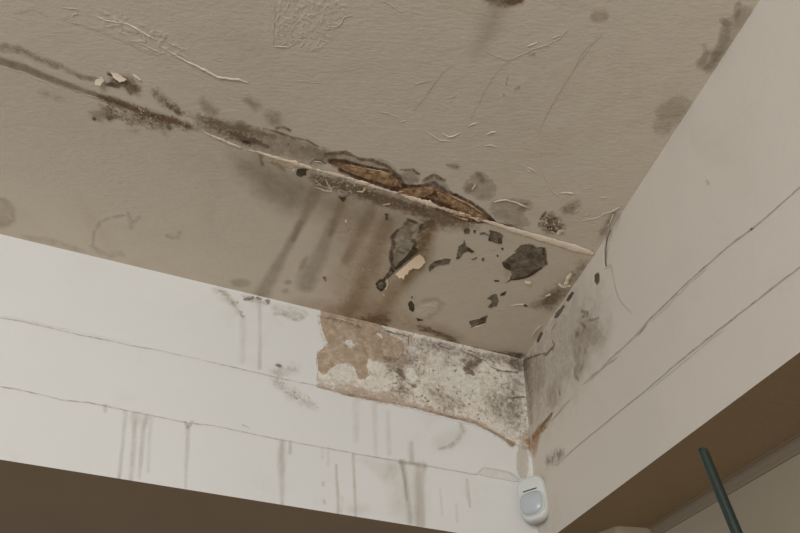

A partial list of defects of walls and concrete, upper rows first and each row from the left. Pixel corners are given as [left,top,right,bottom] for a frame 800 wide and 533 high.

peeling [95,72,141,94]
leakage [93,94,445,181]
crack [0,386,477,475]
crack [0,315,514,446]
leakage [359,315,389,326]
spalling [341,164,548,328]
crack [440,341,555,373]
crack [540,398,571,428]
crack [565,266,800,457]
crack [584,186,800,383]